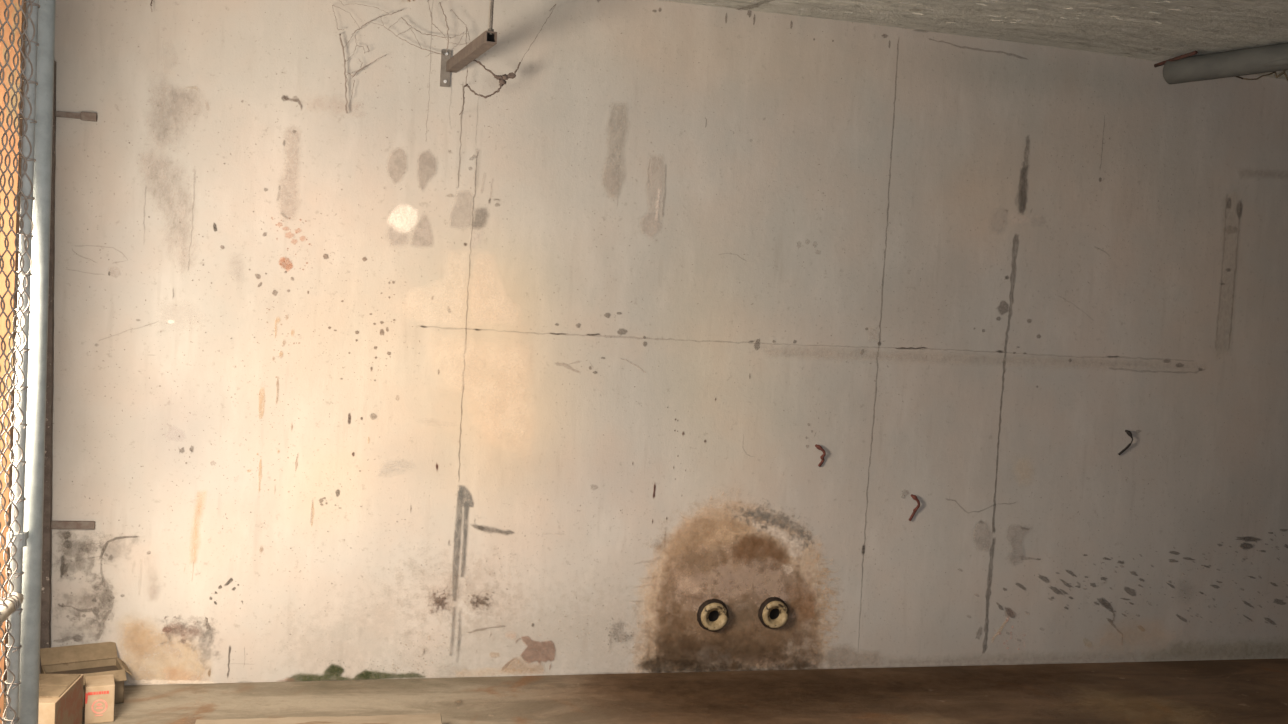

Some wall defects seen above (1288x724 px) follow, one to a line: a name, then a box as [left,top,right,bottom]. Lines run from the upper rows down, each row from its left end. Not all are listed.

water stain [634,508,1035,712]